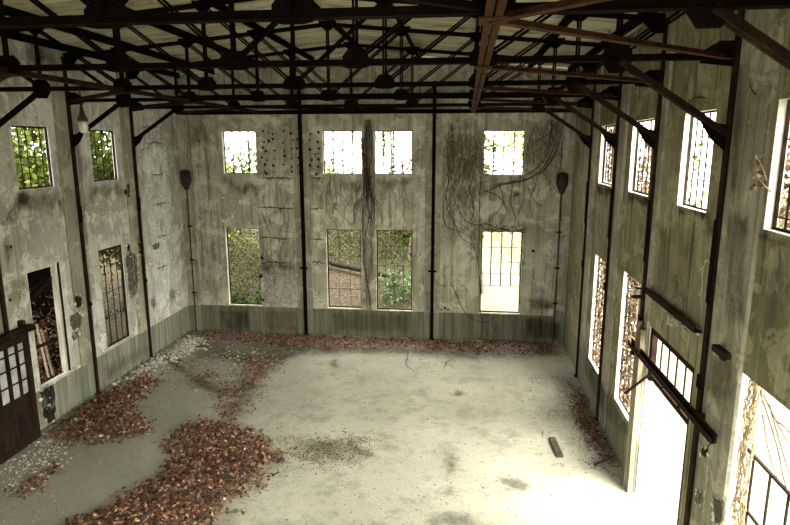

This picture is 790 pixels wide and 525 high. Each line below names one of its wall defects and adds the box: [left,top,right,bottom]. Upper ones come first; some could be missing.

peeling [110,136,176,332]
spalling [68,294,83,342]
spalling [39,382,57,423]